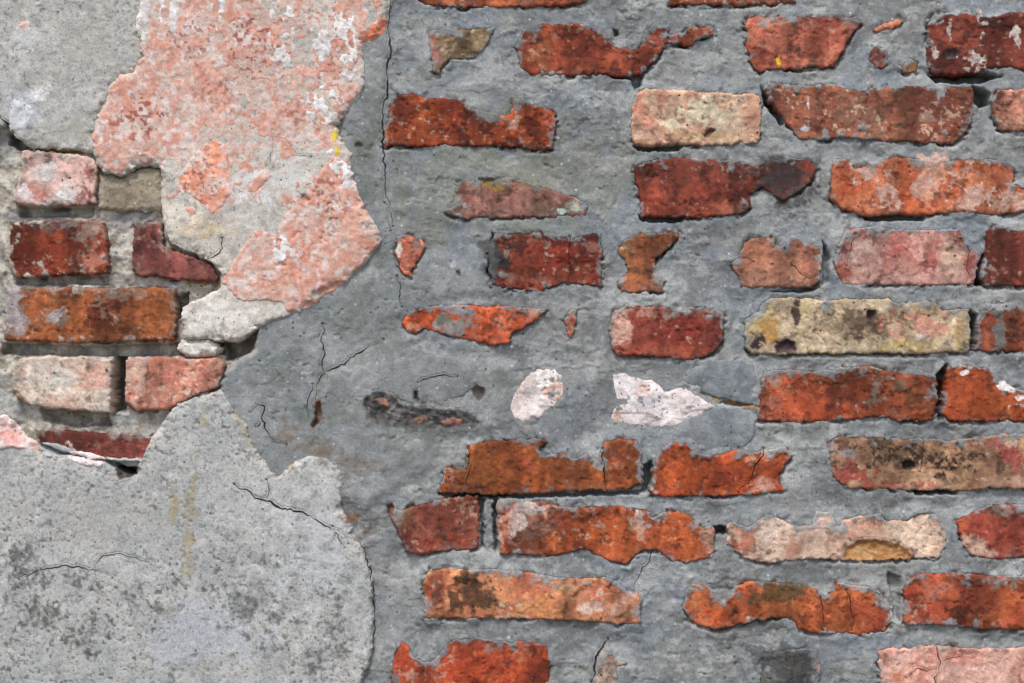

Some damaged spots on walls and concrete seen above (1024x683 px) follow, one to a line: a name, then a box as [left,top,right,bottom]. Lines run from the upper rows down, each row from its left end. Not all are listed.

peeling [93,0,389,312]
crack [379,0,398,230]
flaking render [0,414,142,468]
crack [249,402,287,446]
crack [305,324,384,426]
crack [18,552,187,590]
crack [234,480,378,674]